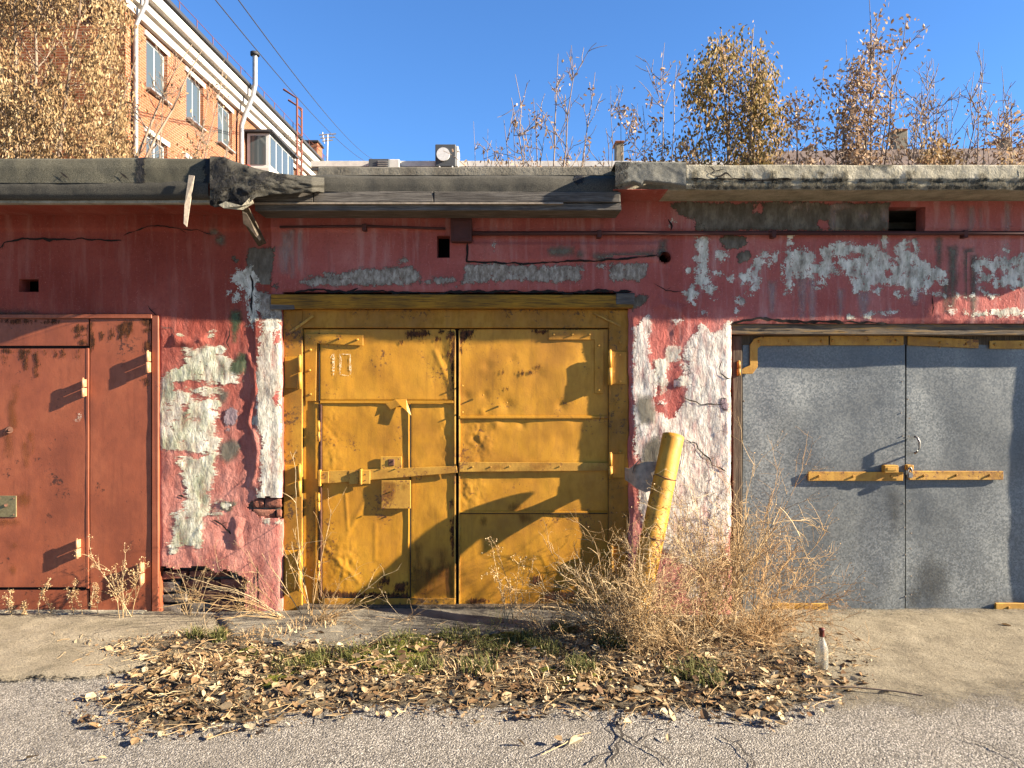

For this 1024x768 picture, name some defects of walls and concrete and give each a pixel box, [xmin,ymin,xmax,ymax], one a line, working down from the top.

crack [0,225,213,248]
crack [295,243,660,295]
rust [2,319,151,377]
peeling [630,201,1024,598]
peeling [159,246,283,613]